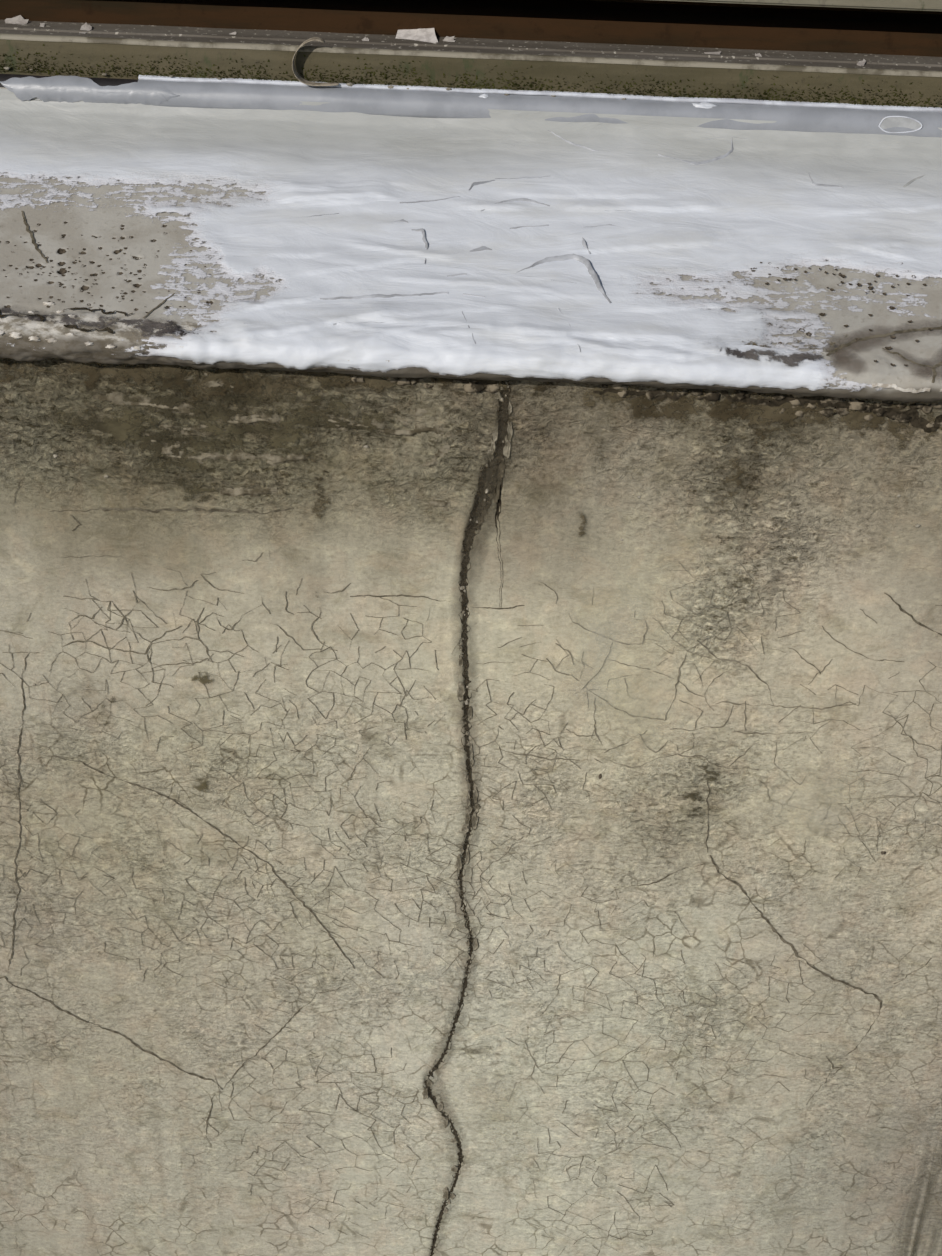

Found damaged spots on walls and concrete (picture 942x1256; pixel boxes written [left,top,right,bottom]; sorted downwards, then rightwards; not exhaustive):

spalling [0,221,167,349]
spalling [750,262,926,310]
spalling [386,377,434,388]
spalling [454,379,501,393]
spalling [593,383,942,433]
crack [0,380,942,1256]